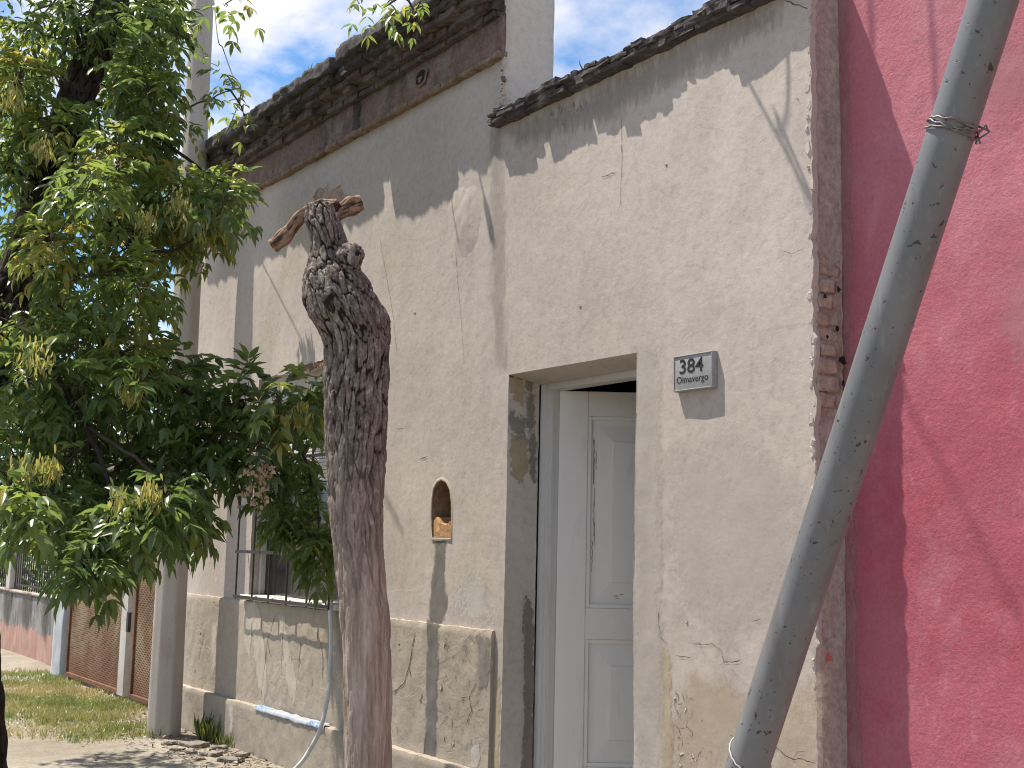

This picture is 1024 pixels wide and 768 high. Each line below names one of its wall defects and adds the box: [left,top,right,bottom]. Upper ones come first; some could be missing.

peeling [509,376,525,406]
spalling [807,250,846,473]
peeling [510,435,529,484]
crack [394,634,423,704]
crack [658,613,741,665]
peeling [660,648,712,768]